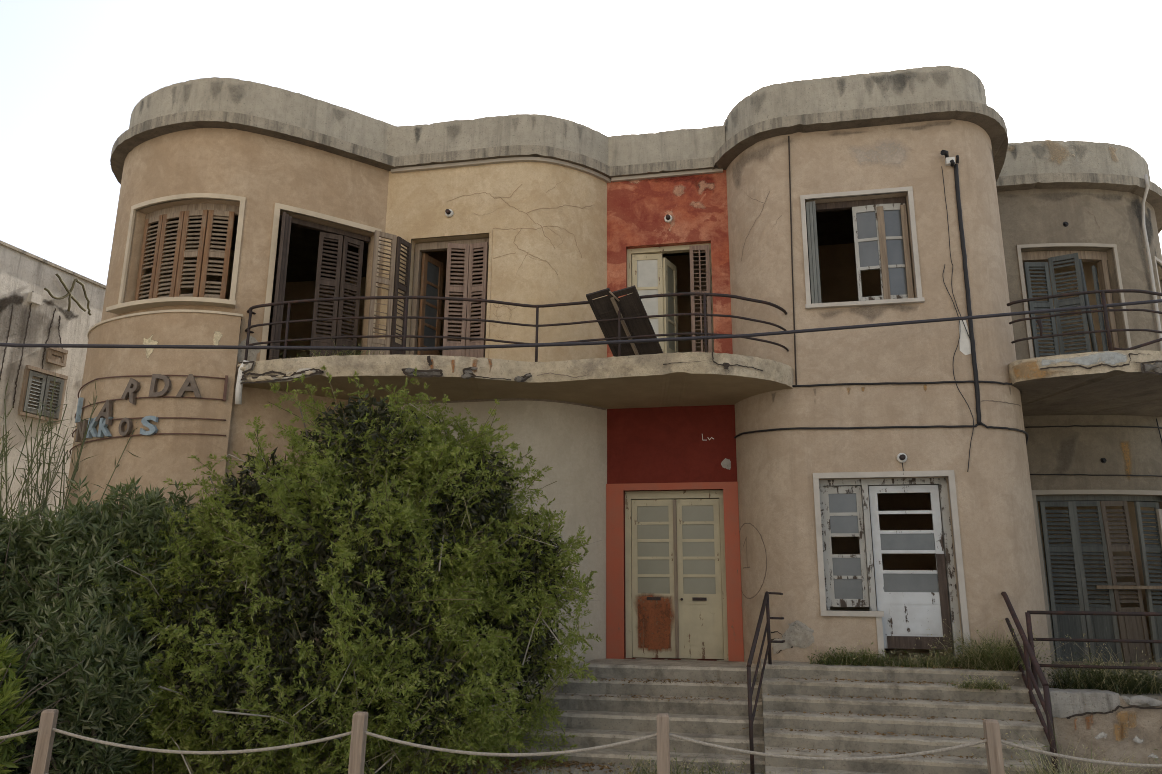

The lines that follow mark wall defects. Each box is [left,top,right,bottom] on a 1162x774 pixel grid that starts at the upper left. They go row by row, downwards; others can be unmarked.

crack [449,182,592,275]
spalling [237,336,324,384]
spalling [402,368,443,378]
spalling [461,366,478,379]
crack [476,372,586,380]
spalling [1140,360,1162,375]
crack [1066,705,1162,729]